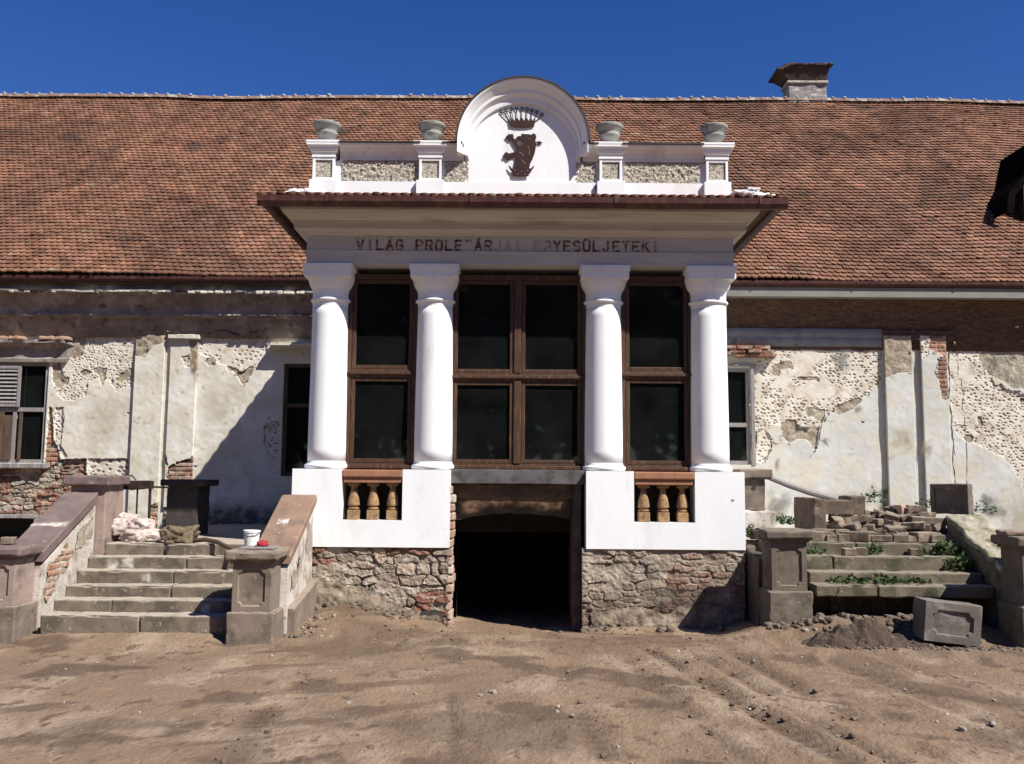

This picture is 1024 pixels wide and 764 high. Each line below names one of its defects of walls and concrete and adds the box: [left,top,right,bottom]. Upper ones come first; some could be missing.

flaking render [52,337,134,388]
flaking render [135,331,170,357]
flaking render [189,340,263,386]
flaking render [772,359,822,381]
flaking render [875,330,956,400]
flaking render [978,352,1024,402]
flaking render [45,407,68,469]
flaking render [780,397,861,449]
crack [948,351,969,483]
flaking render [166,457,201,479]
flaking render [43,520,93,601]